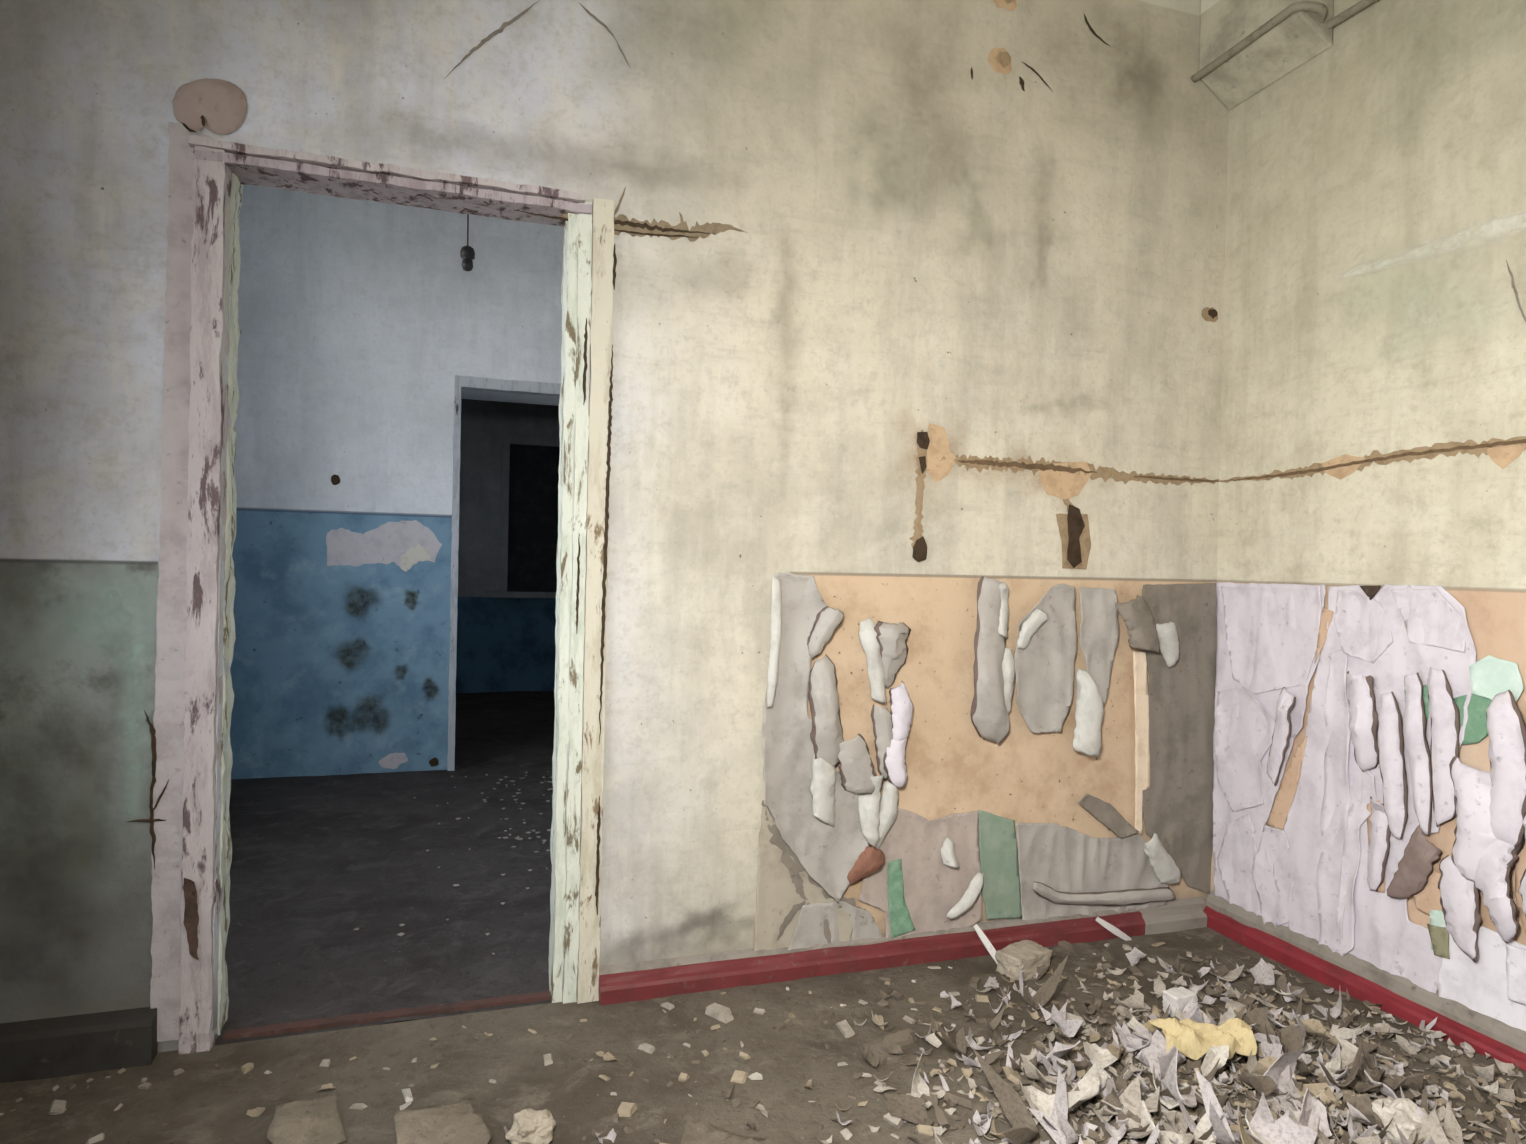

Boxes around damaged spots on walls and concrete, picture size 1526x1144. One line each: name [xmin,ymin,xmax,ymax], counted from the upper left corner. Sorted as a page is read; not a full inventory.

crack [444,1,538,79]
crack [580,4,630,67]
crack [515,187,747,290]
flaking render [150,78,247,1042]
water stain [348,589,377,616]
peeling [326,520,442,572]
crack [576,318,613,743]
water stain [327,699,386,736]
water stain [424,679,438,697]
crack [127,710,169,869]
peeling [754,573,1526,1031]
crack [594,796,602,915]